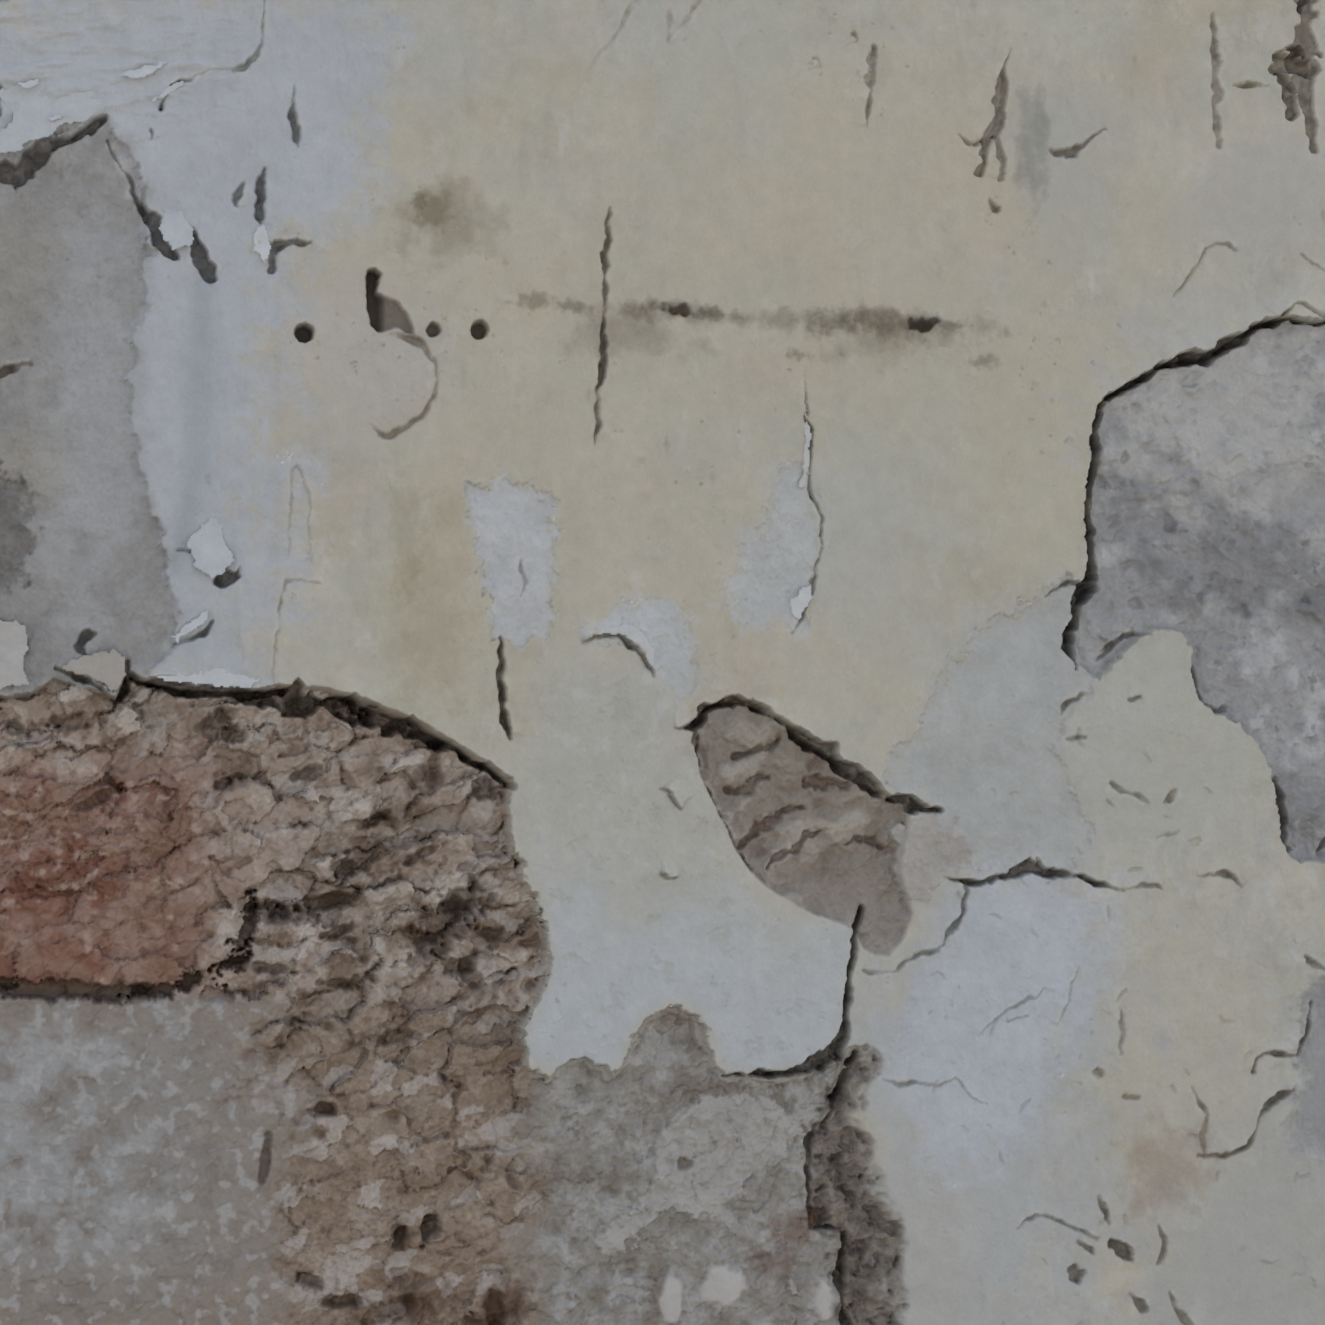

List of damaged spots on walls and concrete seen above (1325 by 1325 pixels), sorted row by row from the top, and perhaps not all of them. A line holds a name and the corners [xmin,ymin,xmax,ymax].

crack [593,208,614,446]
crack [1173,242,1239,297]
crack [1300,253,1325,272]
spalling [0,0,908,1325]
peeling [698,319,1325,956]
crack [1045,301,1325,671]
crack [721,857,1165,1325]
peeling [886,874,1119,1178]
crack [1195,870,1245,889]
crack [1197,954,1325,1160]